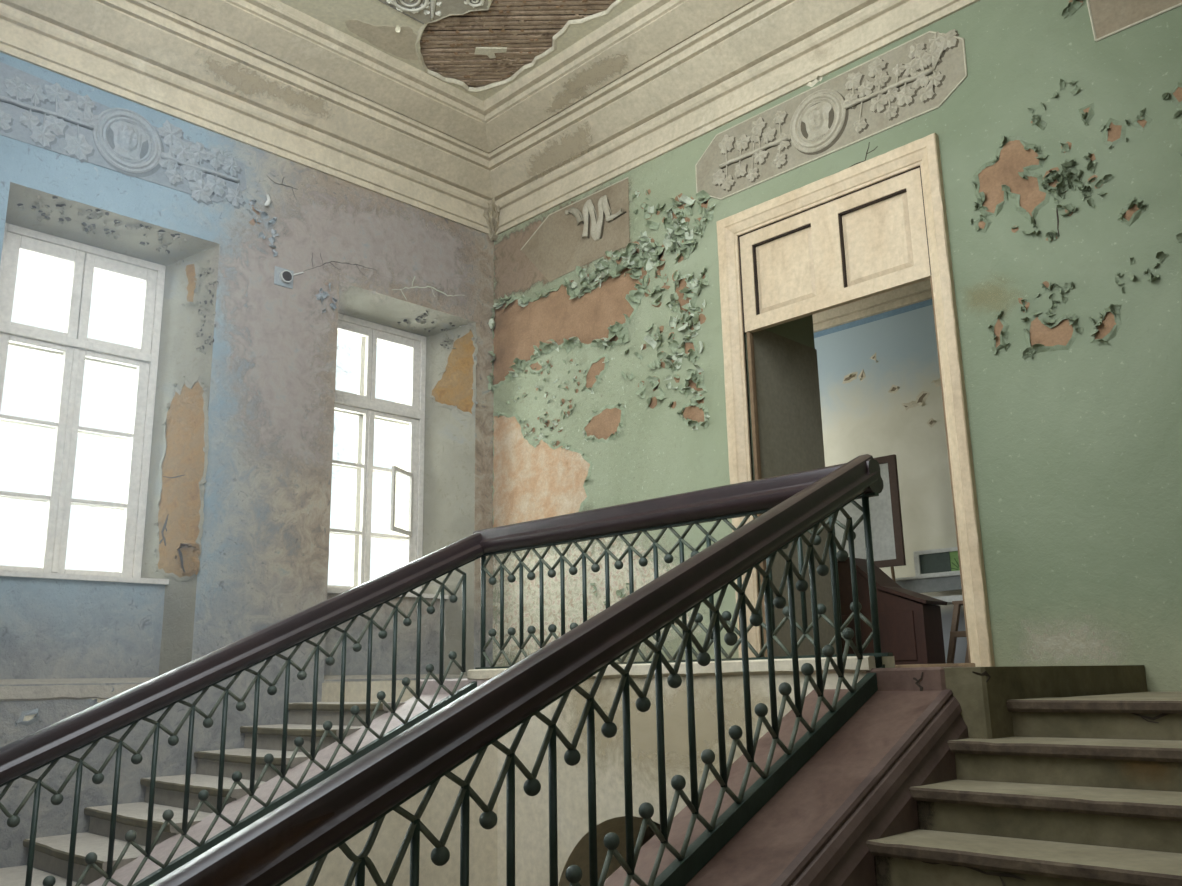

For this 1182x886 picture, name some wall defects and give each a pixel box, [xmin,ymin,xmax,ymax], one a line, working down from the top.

peeling [341,0,625,93]
peeling [970,78,1152,242]
peeling [1162,82,1182,129]
peeling [17,194,219,355]
peeling [397,189,715,528]
peeling [987,251,1169,359]
flaking render [153,376,209,582]